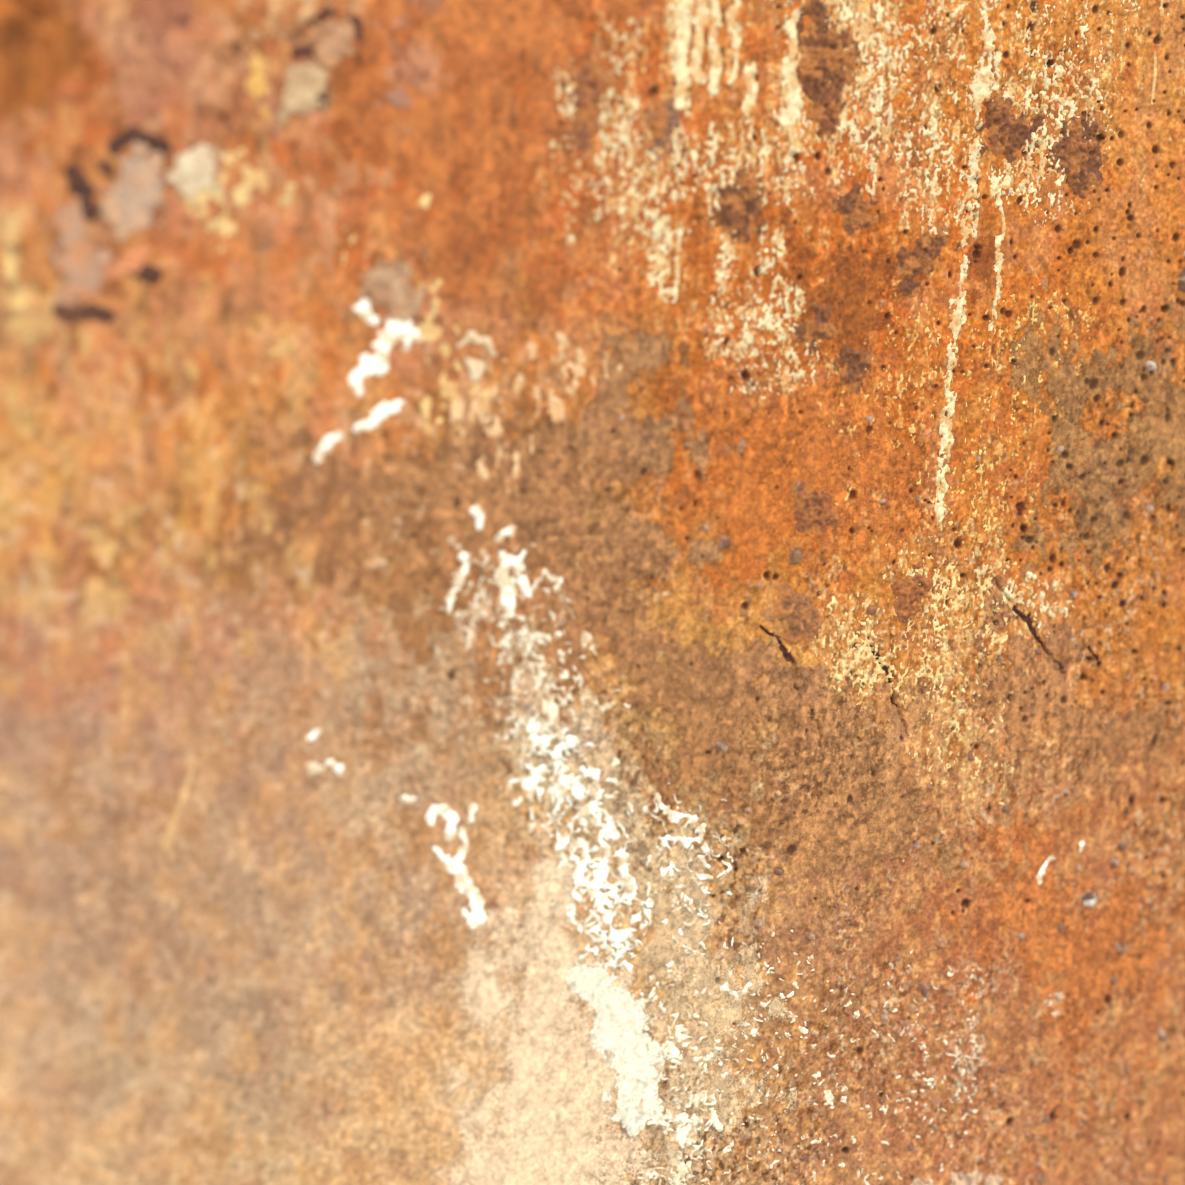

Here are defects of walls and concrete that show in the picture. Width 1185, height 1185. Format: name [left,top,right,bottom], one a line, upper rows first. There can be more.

peeling [246,0,356,127]
corrosion [794,0,866,142]
peeling [47,140,269,311]
peeling [418,194,431,210]
corrosion [976,94,1108,199]
efflorescence [348,299,422,397]
efflorescence [313,398,406,464]
corrosion [653,183,1000,645]
crack [759,625,823,736]
crack [870,642,909,736]
damp [425,525,860,1185]
damp [859,963,990,1148]